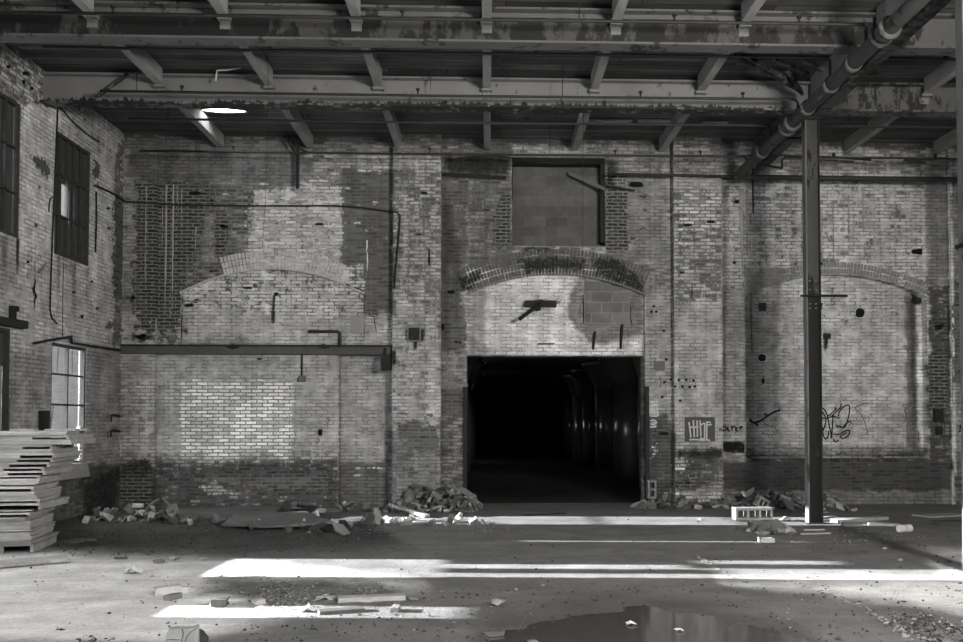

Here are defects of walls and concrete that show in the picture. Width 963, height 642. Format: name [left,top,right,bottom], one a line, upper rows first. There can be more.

peeling [105,180,229,344]
peeling [242,163,379,276]